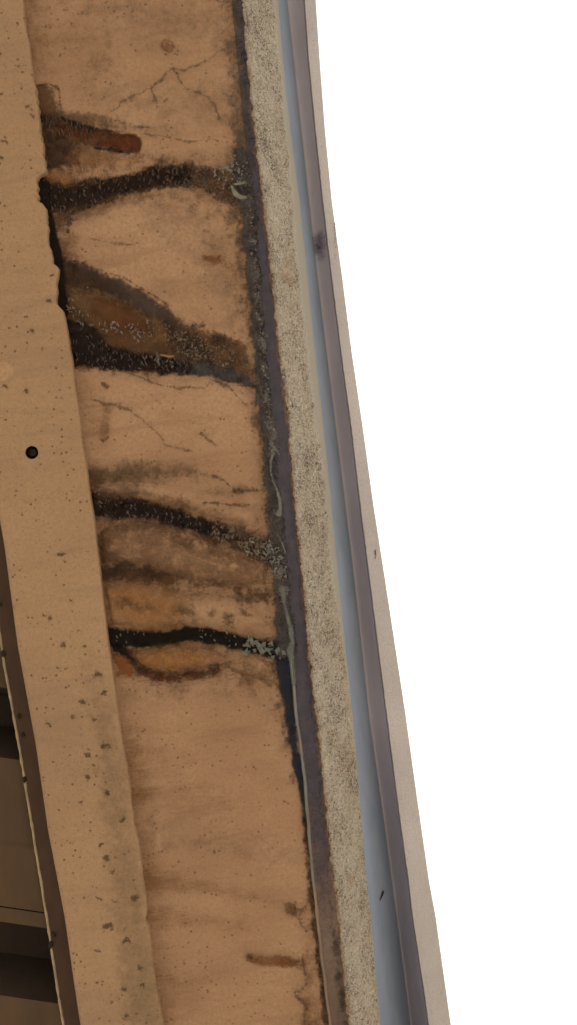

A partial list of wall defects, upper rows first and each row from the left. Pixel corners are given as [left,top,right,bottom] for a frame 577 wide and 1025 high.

rust [40,112,145,184]
leakage [36,0,329,881]
rust [247,954,303,968]